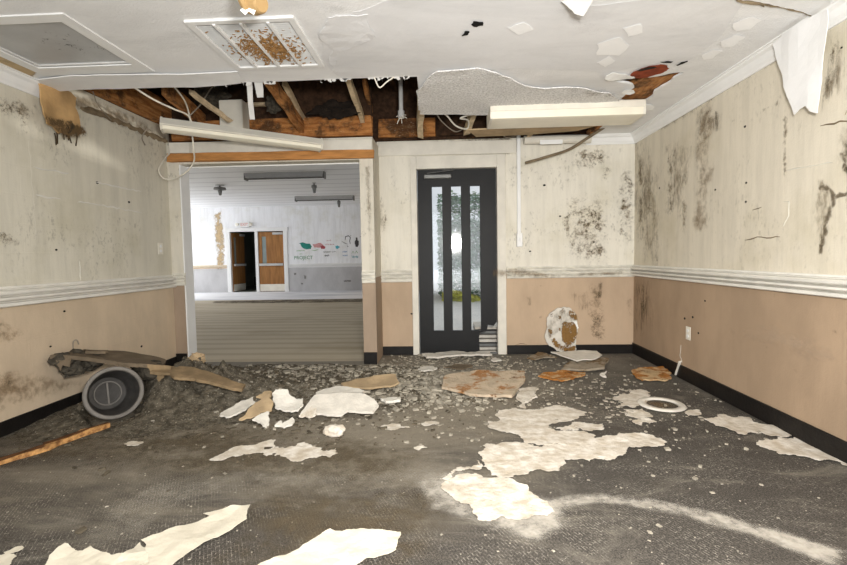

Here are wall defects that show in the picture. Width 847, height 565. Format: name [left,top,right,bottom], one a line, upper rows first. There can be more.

flaking render [319,0,831,115]
peeling [38,71,241,146]
water stain [819,185,847,253]